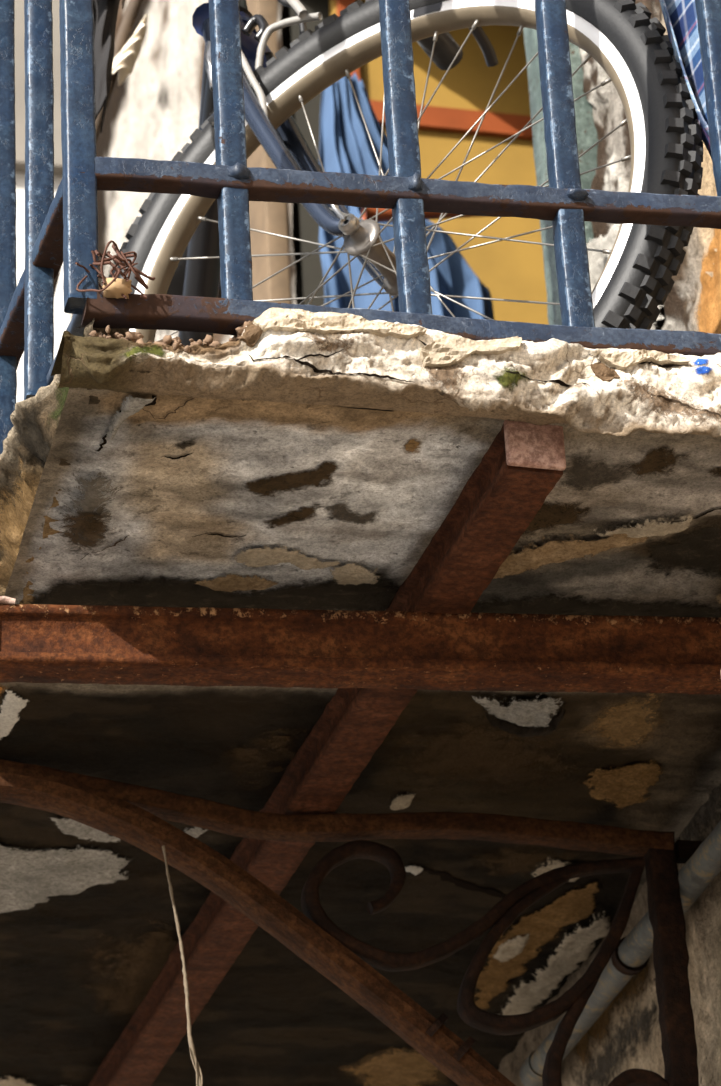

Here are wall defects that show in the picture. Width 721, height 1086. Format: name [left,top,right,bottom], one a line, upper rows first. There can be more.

flaking render [586,224,621,292]
crack [248,349,413,382]
flaking render [240,307,522,392]
flaking render [590,349,721,424]
spalling [106,395,155,440]
damp [245,461,338,497]
damp [523,446,690,535]
damp [265,503,376,528]
crack [678,508,721,524]
damp [470,593,721,618]
spalling [471,692,566,737]
peeling [0,817,134,913]